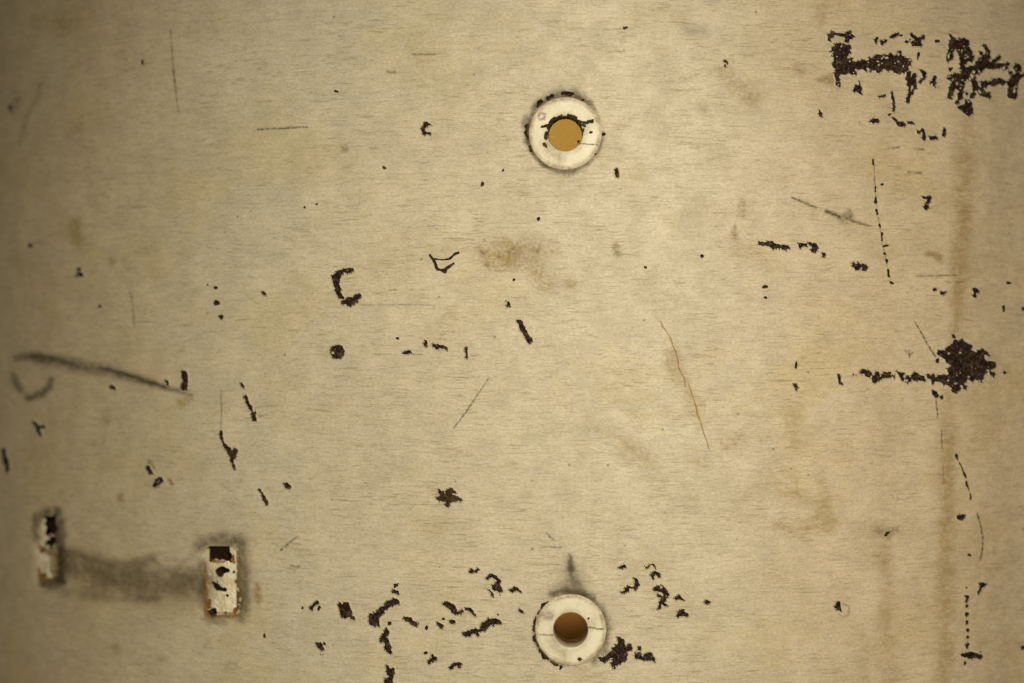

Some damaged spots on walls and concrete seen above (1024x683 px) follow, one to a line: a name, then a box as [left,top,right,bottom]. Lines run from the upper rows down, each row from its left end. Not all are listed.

rust [537,91,584,108]
rust [38,520,58,582]
rust [204,555,241,618]
rust [532,601,563,670]